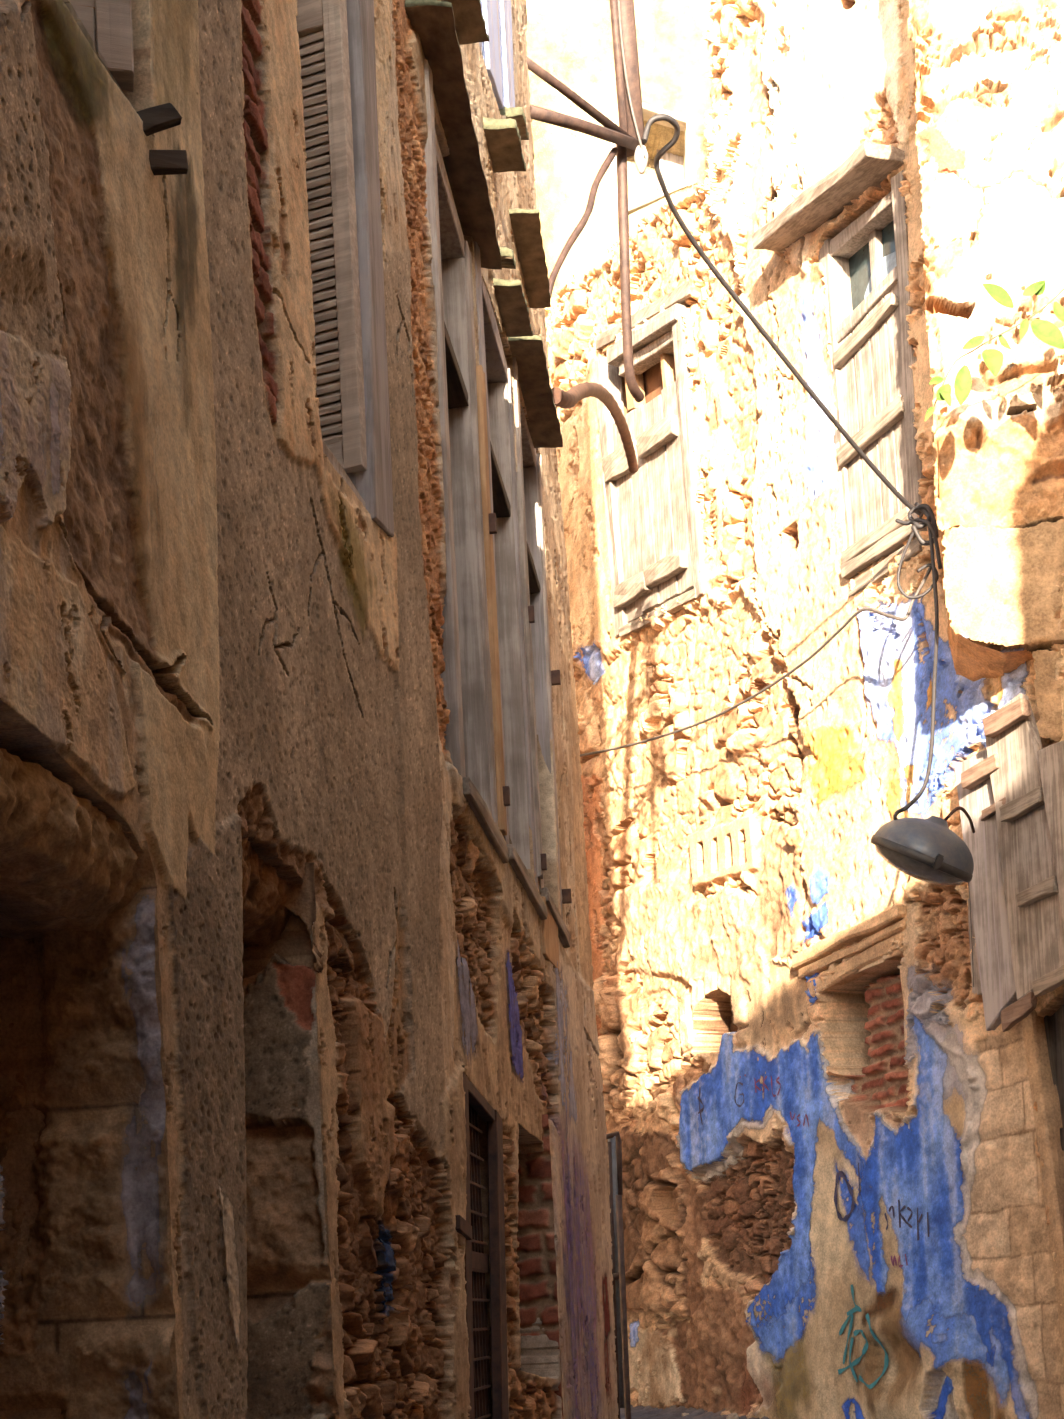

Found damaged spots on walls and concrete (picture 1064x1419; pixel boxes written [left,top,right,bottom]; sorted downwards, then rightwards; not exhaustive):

spalling [0,0,210,732]
spalling [240,0,285,442]
spalling [707,0,775,135]
spalling [835,74,905,169]
peeling [924,0,1064,116]
spalling [924,287,1064,531]
crack [937,126,1064,241]
crack [258,496,364,719]
spalling [392,0,562,1142]
spalling [546,182,1038,1419]
spalling [236,766,457,1419]
spalling [501,1115,563,1419]